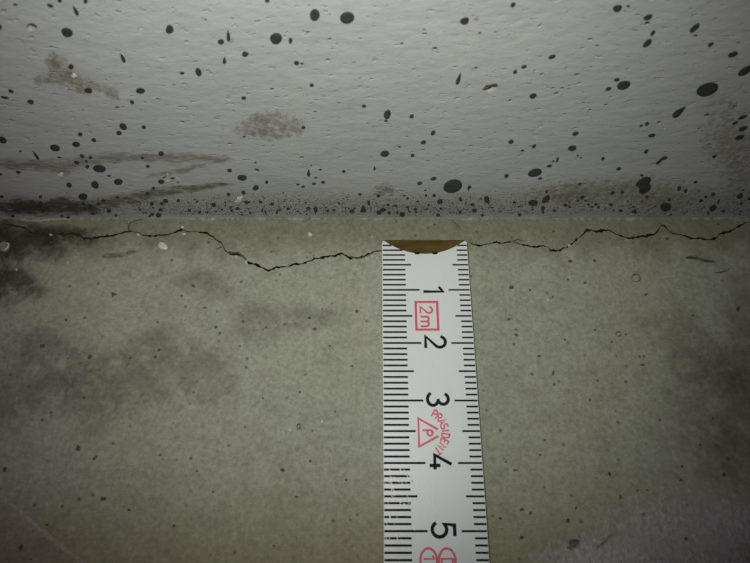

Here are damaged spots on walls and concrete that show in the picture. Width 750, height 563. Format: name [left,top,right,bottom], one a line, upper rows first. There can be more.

damp [0,183,229,215]
damp [0,223,92,259]
crack [2,219,382,272]
crack [451,219,749,252]